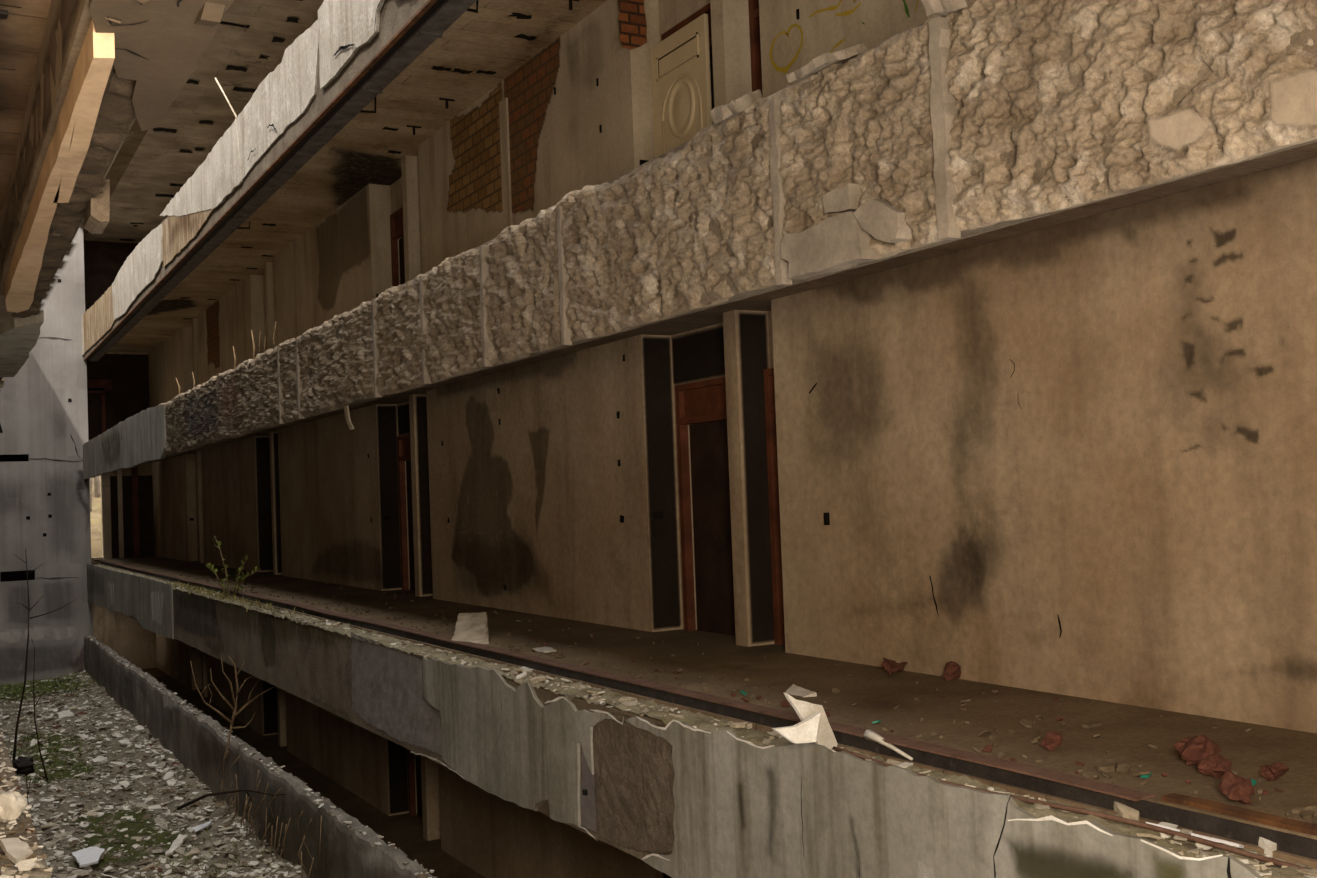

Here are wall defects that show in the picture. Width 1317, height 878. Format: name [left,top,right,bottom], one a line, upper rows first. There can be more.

crack [105,0,182,60]
flaking render [618,0,647,49]
spalling [0,0,78,276]
spalling [13,67,137,318]
flaking render [447,36,560,213]
spalling [84,635,437,878]
spalling [275,609,462,777]
peeling [494,668,575,711]
spalling [578,690,711,861]
peeling [727,722,774,749]
crack [993,795,1011,878]
crack [1225,857,1233,878]